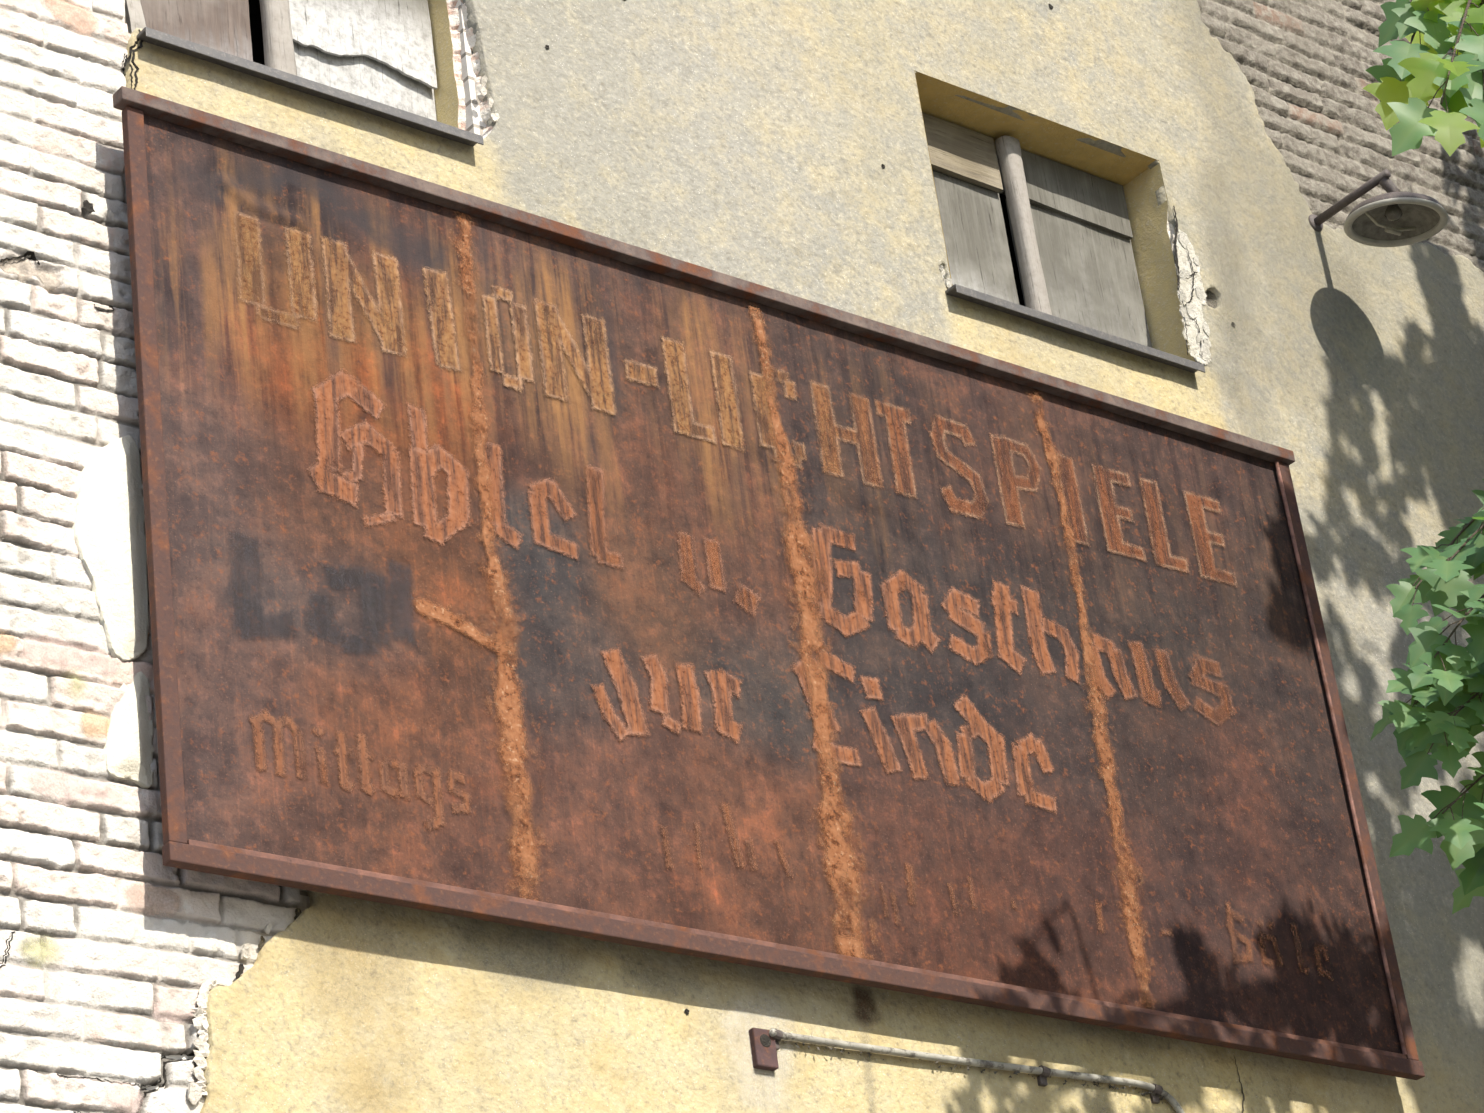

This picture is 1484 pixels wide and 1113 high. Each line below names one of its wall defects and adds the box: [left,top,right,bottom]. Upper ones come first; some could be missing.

flaking render [446,0,500,139]
spalling [0,251,61,293]
flaking render [1167,207,1213,365]
peeling [0,635,117,672]
peeling [82,713,110,736]
peeling [32,770,120,806]
crack [294,908,302,920]
crack [235,936,266,979]
corrosion [855,988,875,1024]
flaking render [154,980,222,1104]
crack [57,1050,199,1113]
crack [1234,1057,1245,1113]